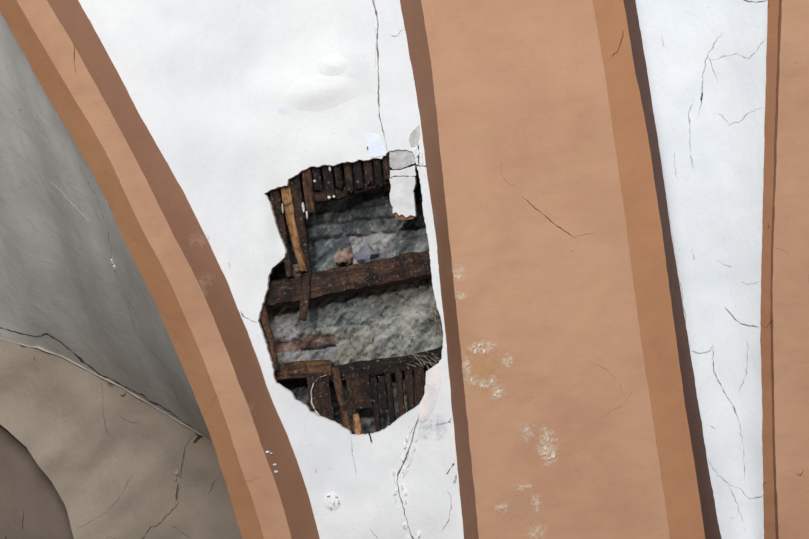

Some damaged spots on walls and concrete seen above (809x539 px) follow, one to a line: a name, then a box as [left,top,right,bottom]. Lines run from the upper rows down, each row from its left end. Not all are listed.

crack [372,0,405,148]
crack [674,32,765,178]
crack [500,162,591,251]
flaking render [258,125,423,435]
crack [0,160,194,539]
crack [392,415,452,539]
flaking render [411,364,442,422]
crack [443,463,457,529]
water stain [463,342,502,398]
water stain [523,427,558,465]
crack [693,308,772,531]